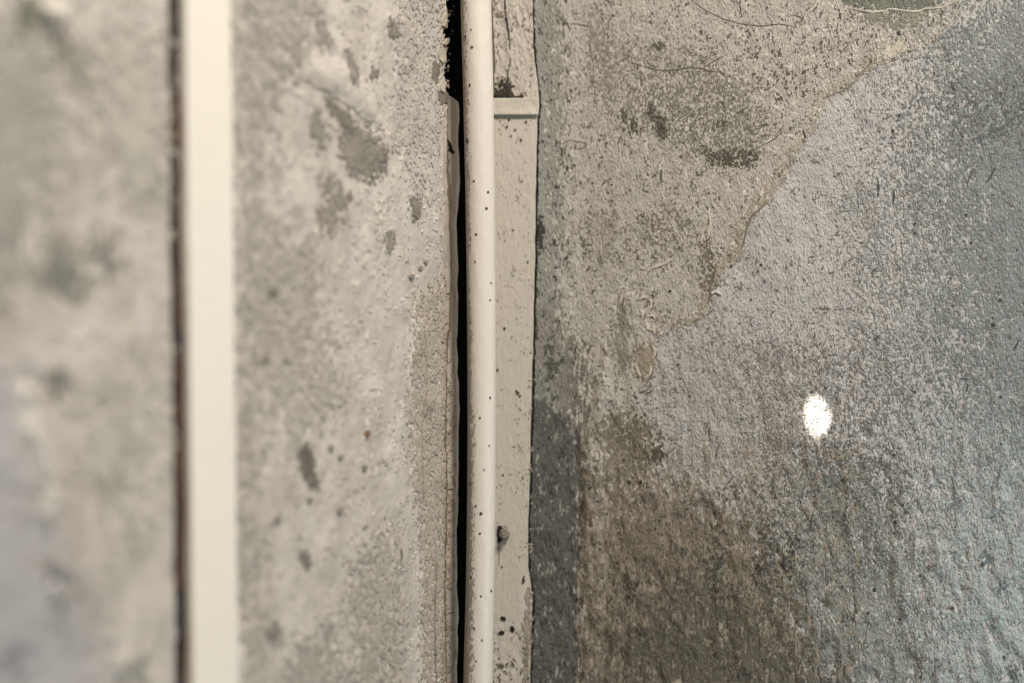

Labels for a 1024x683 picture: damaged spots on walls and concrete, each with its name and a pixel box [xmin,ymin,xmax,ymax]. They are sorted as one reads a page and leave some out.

peeling [541,0,965,683]
water stain [530,0,1024,683]